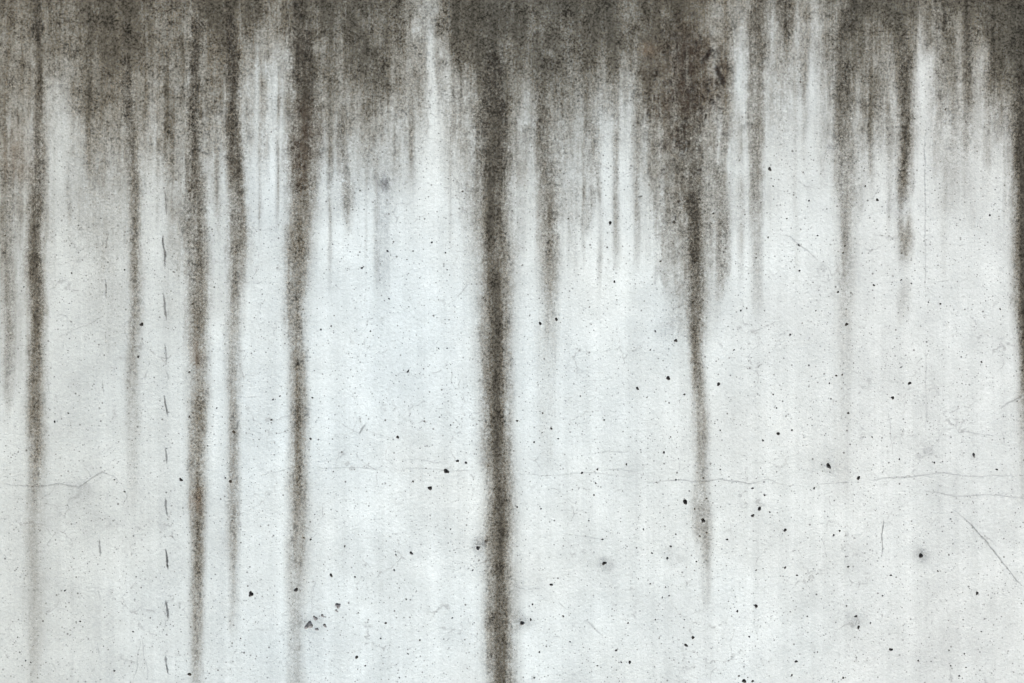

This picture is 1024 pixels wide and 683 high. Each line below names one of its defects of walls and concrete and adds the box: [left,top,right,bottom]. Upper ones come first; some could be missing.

damp [27,0,44,478]
damp [122,57,139,340]
damp [186,19,207,666]
damp [225,6,246,339]
damp [287,0,321,566]
damp [474,43,513,683]
damp [536,96,558,302]
damp [652,10,728,476]
damp [748,0,765,200]
damp [833,0,856,203]
damp [897,48,912,202]
damp [1010,65,1024,422]